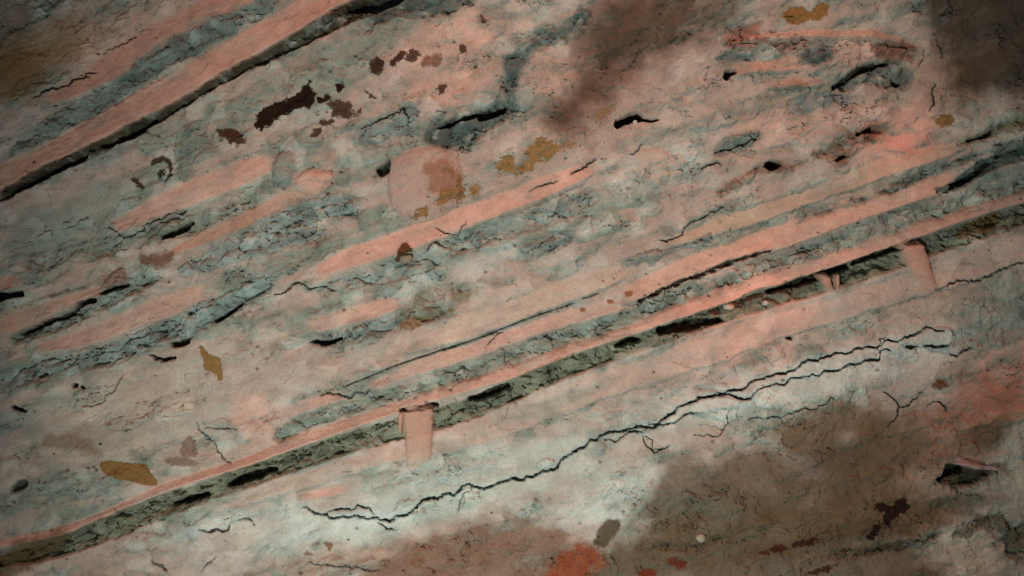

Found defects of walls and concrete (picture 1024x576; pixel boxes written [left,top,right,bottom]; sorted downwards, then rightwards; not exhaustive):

spalling [0,0,477,202]
rust [422,155,462,196]
leakage [530,0,753,143]
crack [325,293,597,398]
spalling [10,114,1024,565]
rust [542,536,611,576]
crack [305,326,971,529]
leakage [593,393,959,576]